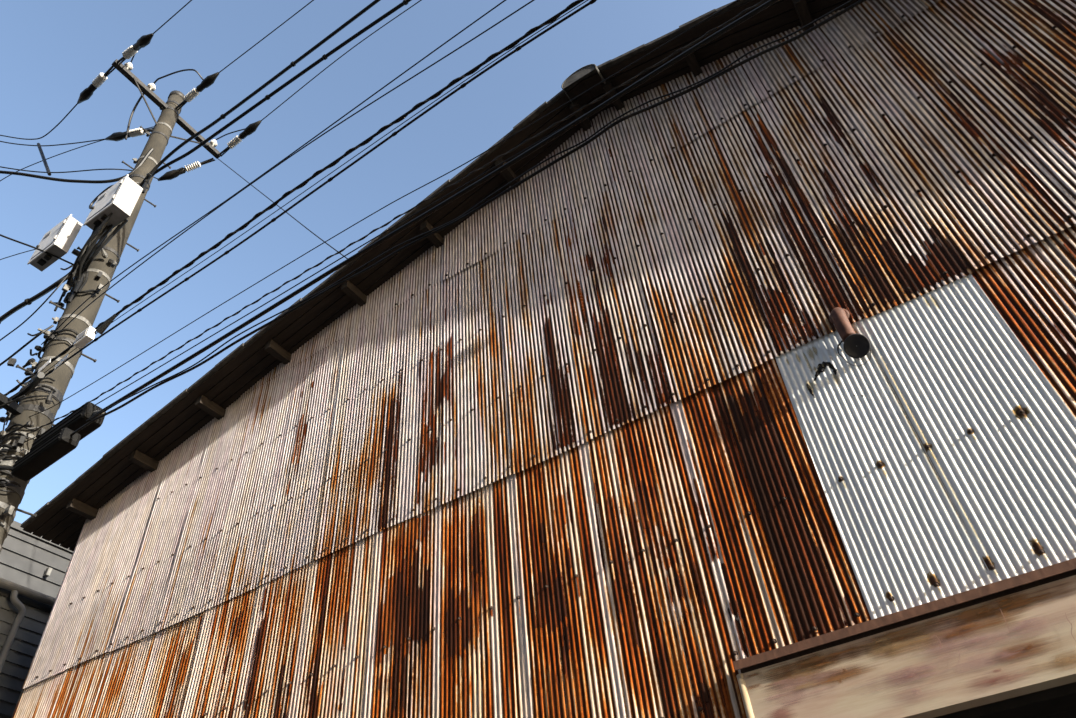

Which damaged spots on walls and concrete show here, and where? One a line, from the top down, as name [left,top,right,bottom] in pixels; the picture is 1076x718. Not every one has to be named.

rust [928,75,1076,262]
rust [971,27,1076,158]
rust [715,97,972,641]
rust [1019,297,1076,375]
rust [164,615,202,718]
rust [197,587,270,718]
rust [274,640,295,718]
rust [305,595,350,718]
rust [375,308,457,718]
rust [445,495,493,718]
rust [518,464,586,718]
rust [542,214,757,718]